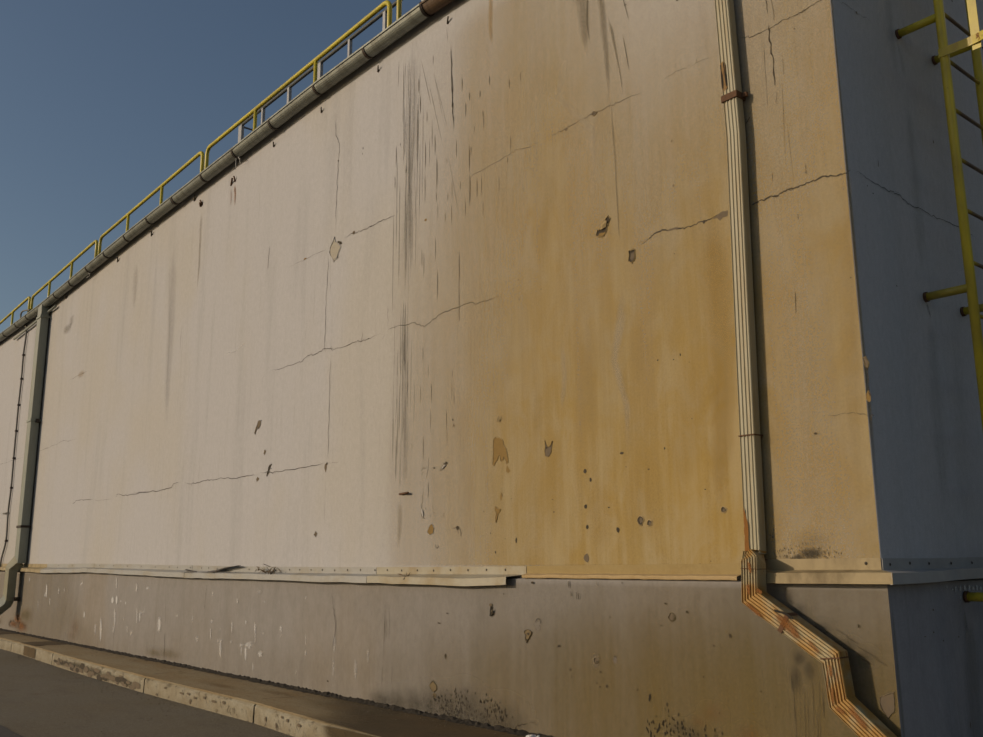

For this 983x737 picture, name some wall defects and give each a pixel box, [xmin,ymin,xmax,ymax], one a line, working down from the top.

rust [720,62,728,91]
crack [745,0,857,103]
peeling [329,237,342,262]
spalling [596,215,611,238]
crack [643,210,728,243]
crack [752,172,972,235]
crack [277,253,490,394]
crack [74,425,329,503]
peeling [492,437,510,473]
damp [325,688,525,737]
damp [551,622,858,737]
damp [835,634,901,737]